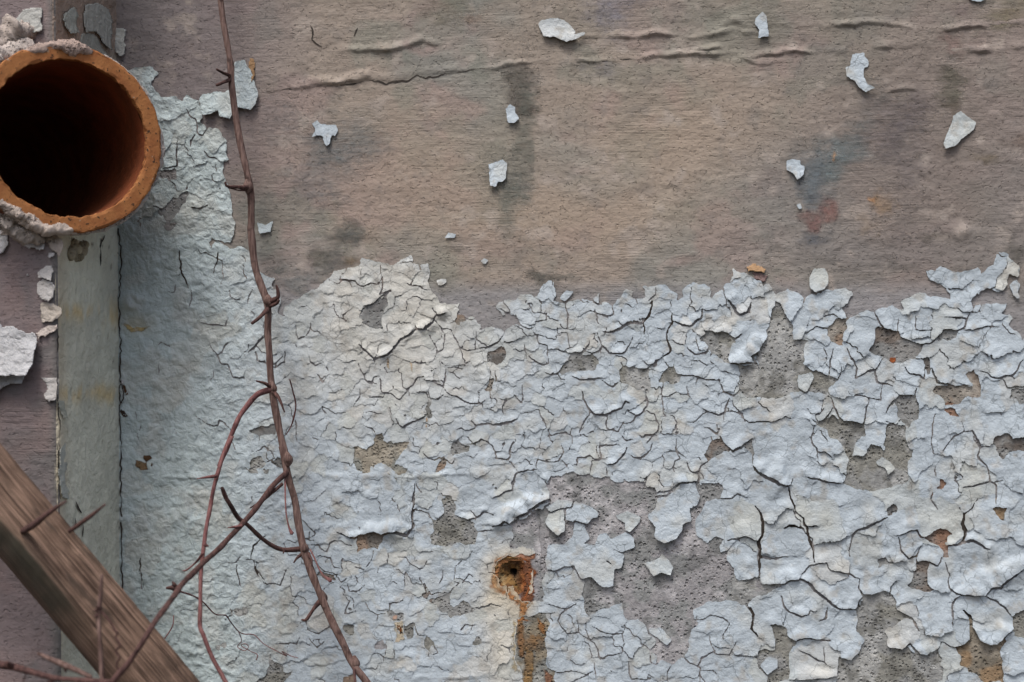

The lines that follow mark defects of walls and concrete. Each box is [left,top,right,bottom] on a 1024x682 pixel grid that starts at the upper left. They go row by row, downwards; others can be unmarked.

peeling [538,18,585,42]
peeling [846,53,875,92]
peeling [944,111,976,148]
peeling [488,159,507,187]
peeling [0,235,90,389]
crack [643,300,674,358]
crack [100,228,144,589]
peeling [260,252,1024,682]
crack [755,485,818,571]
crack [961,498,978,541]
corrosion [491,553,553,682]
crack [748,607,758,636]